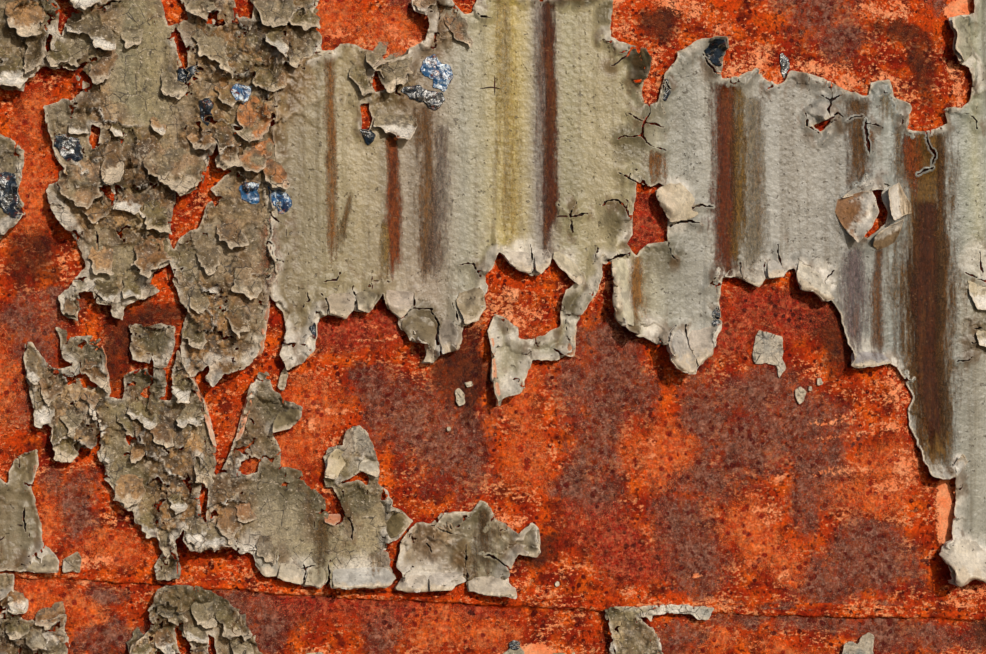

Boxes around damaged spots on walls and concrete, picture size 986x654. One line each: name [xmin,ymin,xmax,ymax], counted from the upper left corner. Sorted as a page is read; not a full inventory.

peeling [0,0,413,590]
corrosion [380,133,402,277]
corrosion [351,324,491,499]
corrosion [534,1,558,253]
peeling [265,0,986,599]
crack [618,103,665,150]
corrosion [708,83,766,279]
corrosion [501,132,986,654]
crack [806,86,880,151]
peeling [0,449,81,654]
peeling [126,584,263,654]
peeling [604,604,714,654]